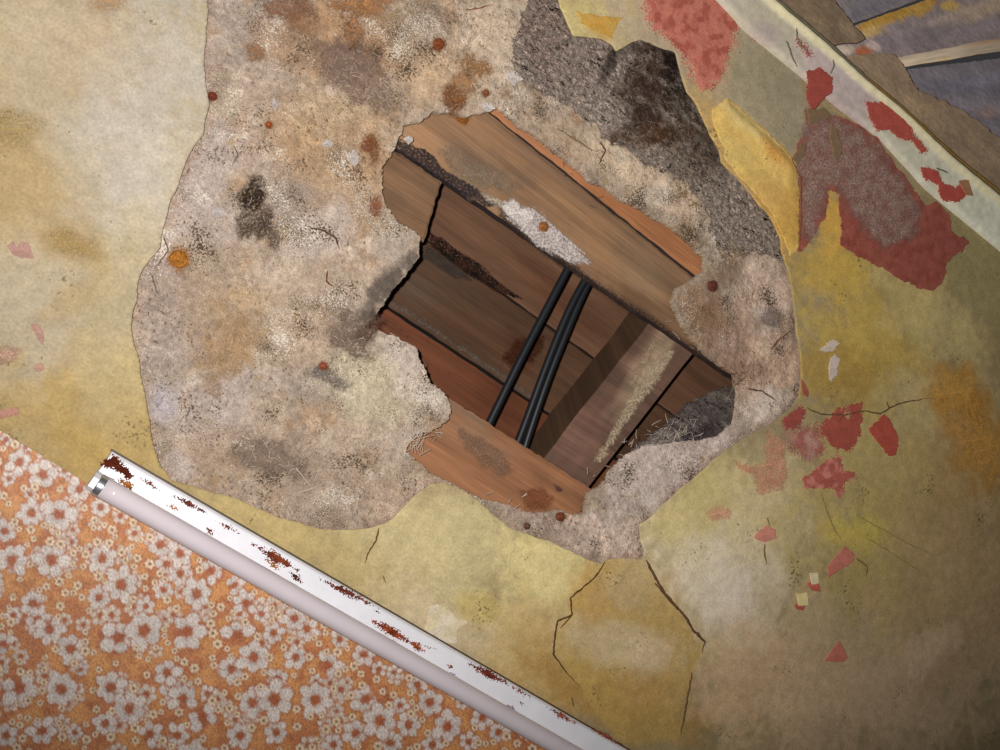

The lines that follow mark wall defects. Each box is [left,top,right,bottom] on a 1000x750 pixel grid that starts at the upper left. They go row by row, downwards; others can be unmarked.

mould [236,176,280,249]
spalling [131,0,899,564]
water stain [397,141,727,385]
peeling [793,38,973,291]
crack [807,398,930,421]
crack [552,562,605,707]
crack [646,560,706,652]
crack [681,673,692,734]